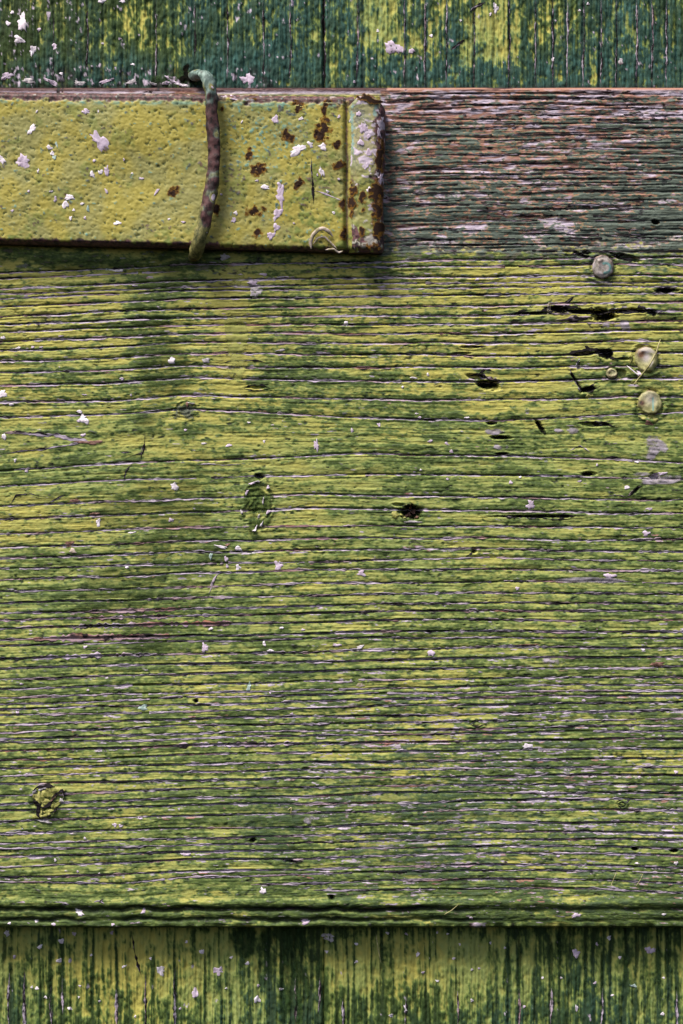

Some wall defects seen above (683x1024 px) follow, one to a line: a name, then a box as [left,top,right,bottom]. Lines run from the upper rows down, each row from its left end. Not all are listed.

corrosion [356,93,382,104]
corrosion [281,128,295,143]
corrosion [313,98,346,170]
corrosion [245,147,266,177]
corrosion [339,138,385,250]
corrosion [245,205,266,239]
crack [0,0,683,454]